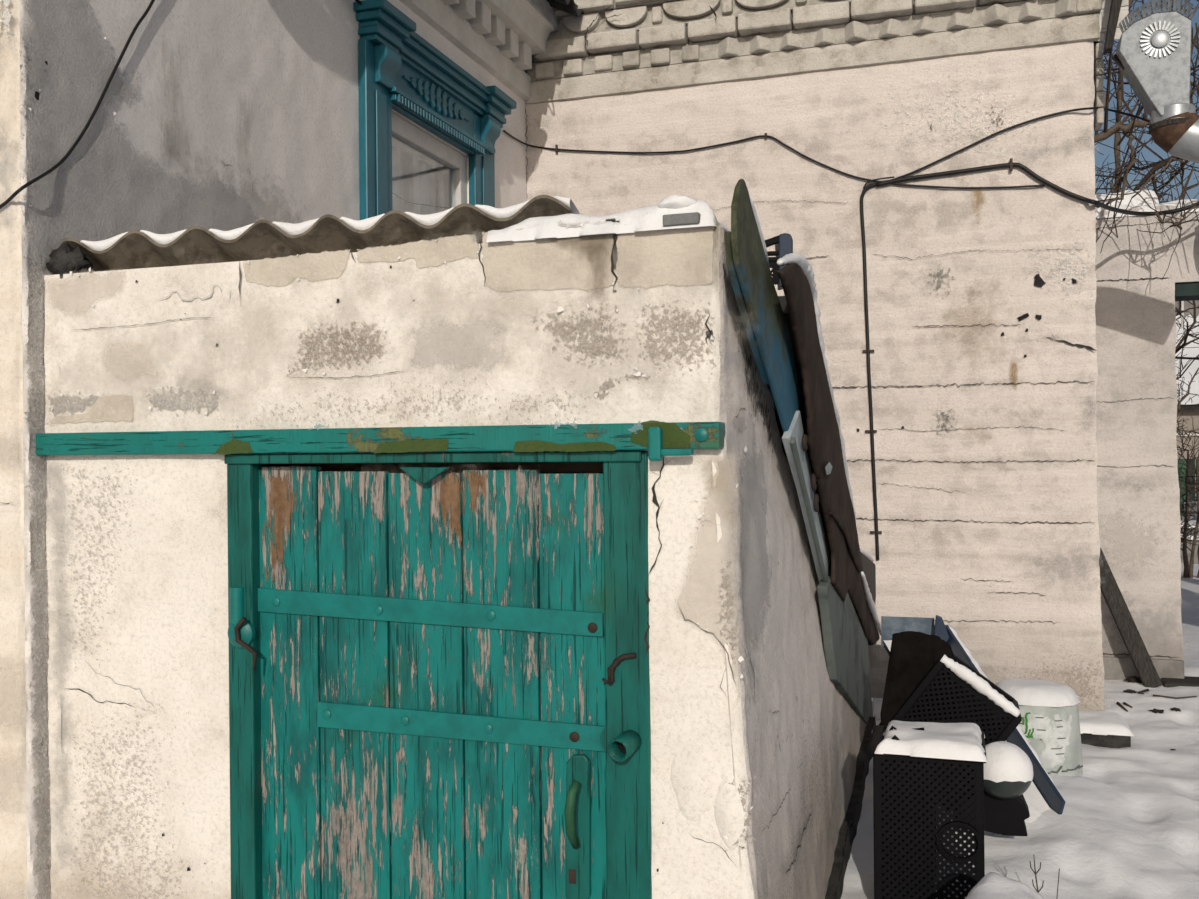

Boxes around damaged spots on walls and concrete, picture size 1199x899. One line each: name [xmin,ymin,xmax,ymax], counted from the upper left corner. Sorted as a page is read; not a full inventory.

crack [610,224,618,290]
peeling [243,223,719,399]
crack [913,321,1019,329]
crack [1047,333,1097,351]
crack [832,380,1170,403]
crack [644,456,675,657]
peeling [718,447,771,695]
crack [61,666,160,748]
crack [679,607,781,727]
crack [785,814,812,875]